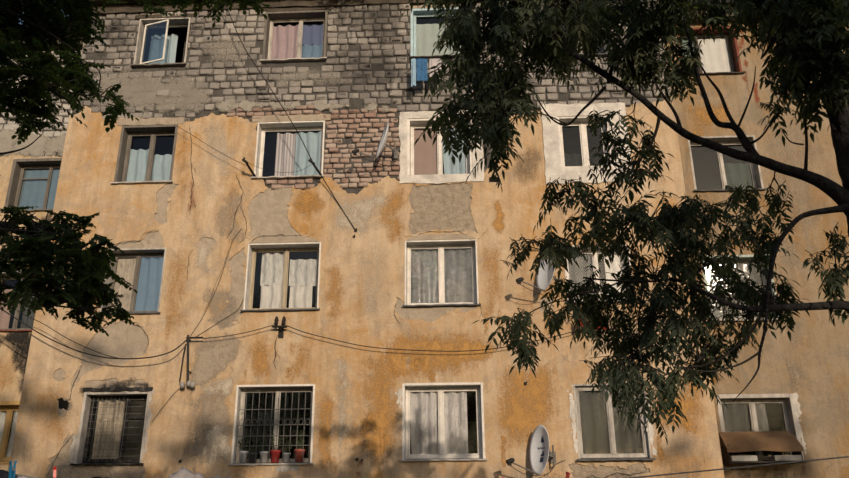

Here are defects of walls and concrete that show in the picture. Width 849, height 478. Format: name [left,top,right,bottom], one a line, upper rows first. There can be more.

crack [188,128,196,212]
crack [202,175,318,316]
spalling [247,184,302,239]
spalling [405,183,477,237]
peeling [191,248,246,464]
spalling [44,320,155,478]
peeling [567,385,578,453]
peeling [645,393,657,455]
spalling [568,462,650,478]